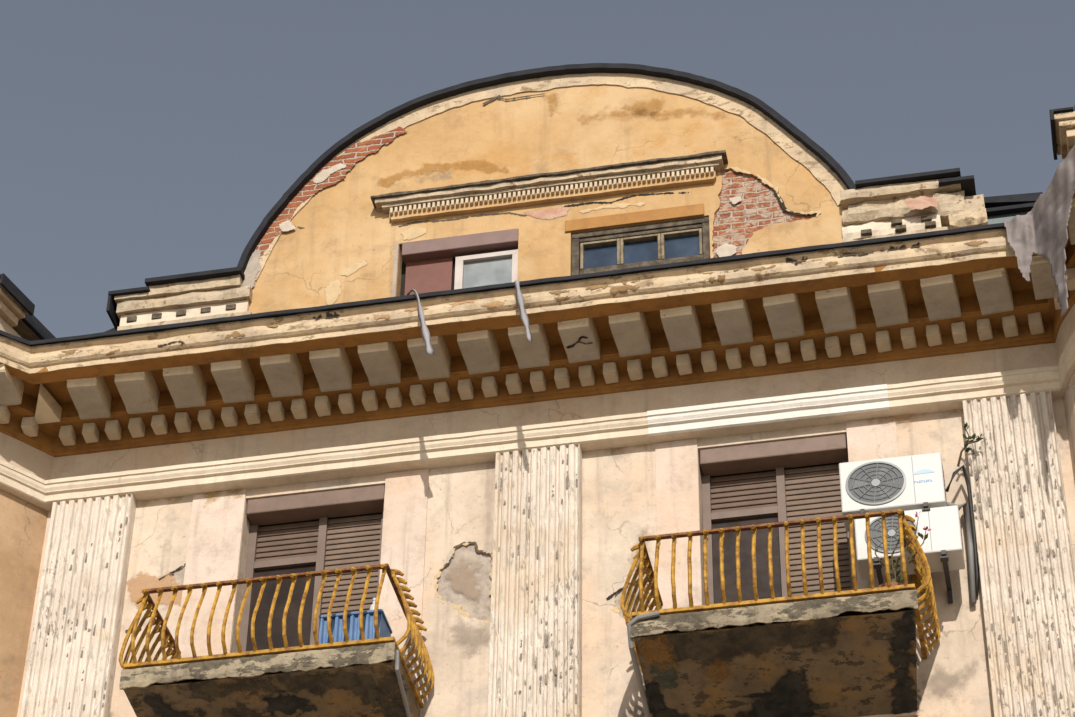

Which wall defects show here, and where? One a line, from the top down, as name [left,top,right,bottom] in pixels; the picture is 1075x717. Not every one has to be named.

water stain [379,161,508,187]
flaking render [242,126,408,288]
crack [564,192,689,214]
flaking render [709,167,821,258]
spalling [825,242,920,267]
peeling [998,444,1064,545]
peeling [127,563,186,608]
flaking render [434,541,500,624]
water stain [660,617,841,665]
water stain [889,610,922,715]
water stain [143,668,411,717]
water stain [705,670,825,717]